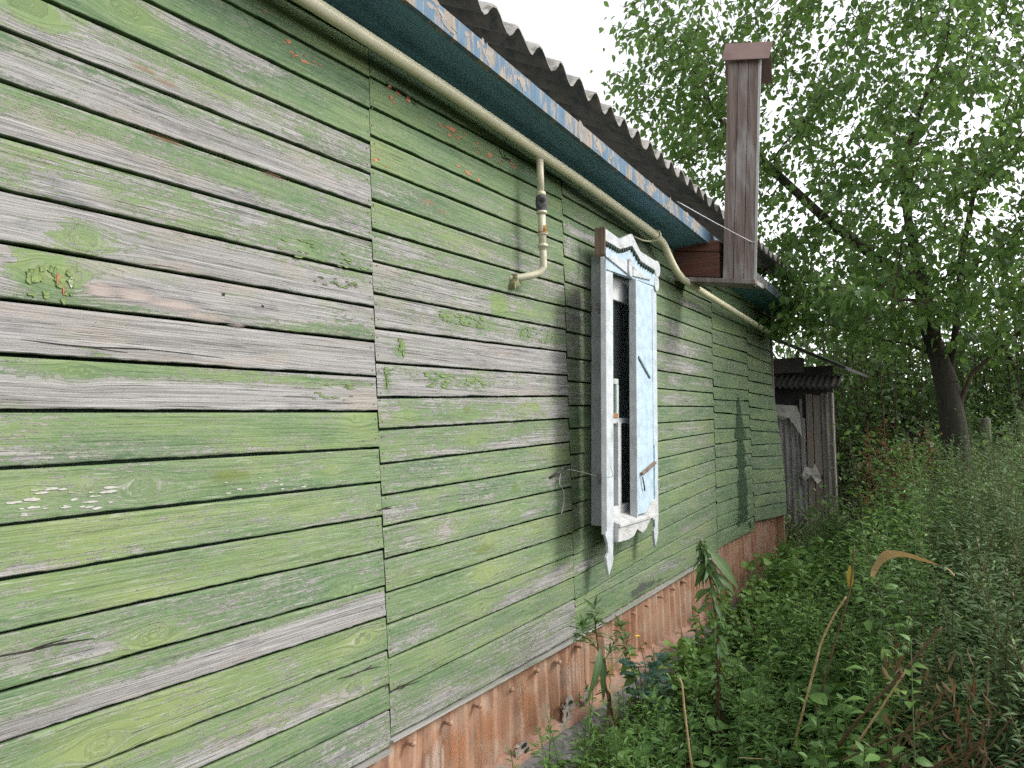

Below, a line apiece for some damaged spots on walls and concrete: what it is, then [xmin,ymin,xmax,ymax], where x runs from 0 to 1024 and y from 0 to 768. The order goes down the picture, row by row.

peeling [426,0,492,67]
peeling [513,72,526,94]
peeling [578,120,612,160]
peeling [26,265,219,320]
damp [735,397,752,527]
peeling [6,486,122,516]